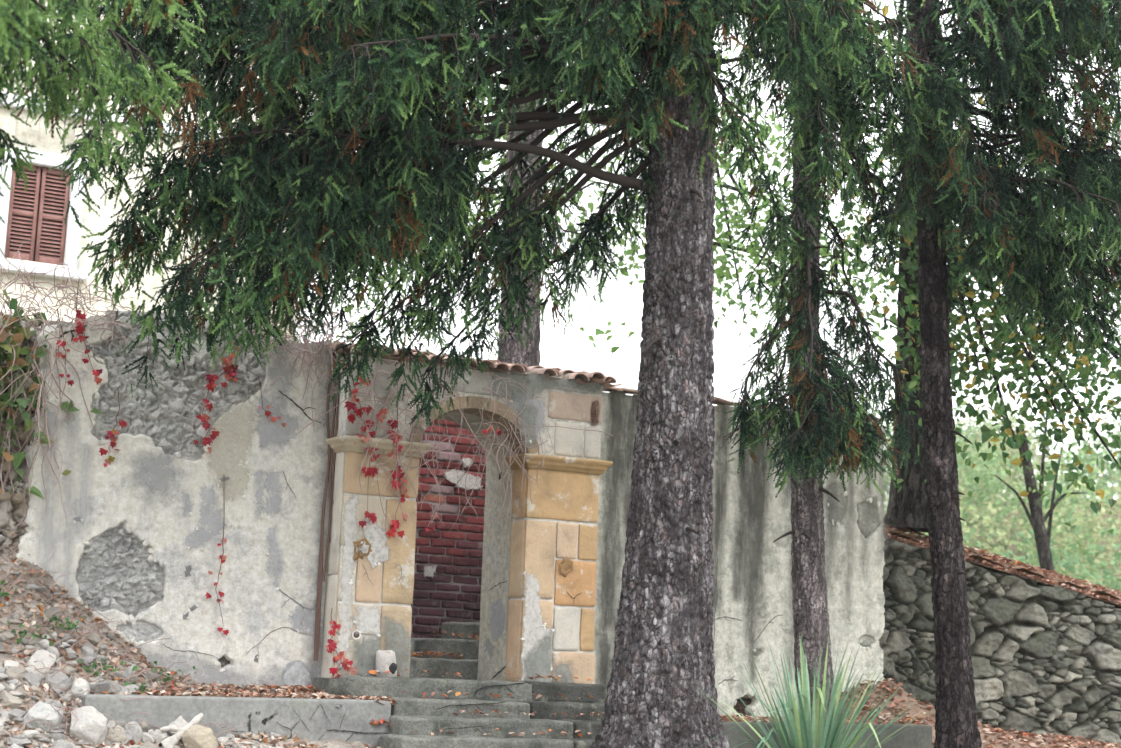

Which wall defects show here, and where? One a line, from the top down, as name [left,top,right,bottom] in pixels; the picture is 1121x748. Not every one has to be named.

flaking render [76,523,165,643]
flaking render [86,310,297,591]
peeling [336,495,389,670]
water stain [713,403,769,678]